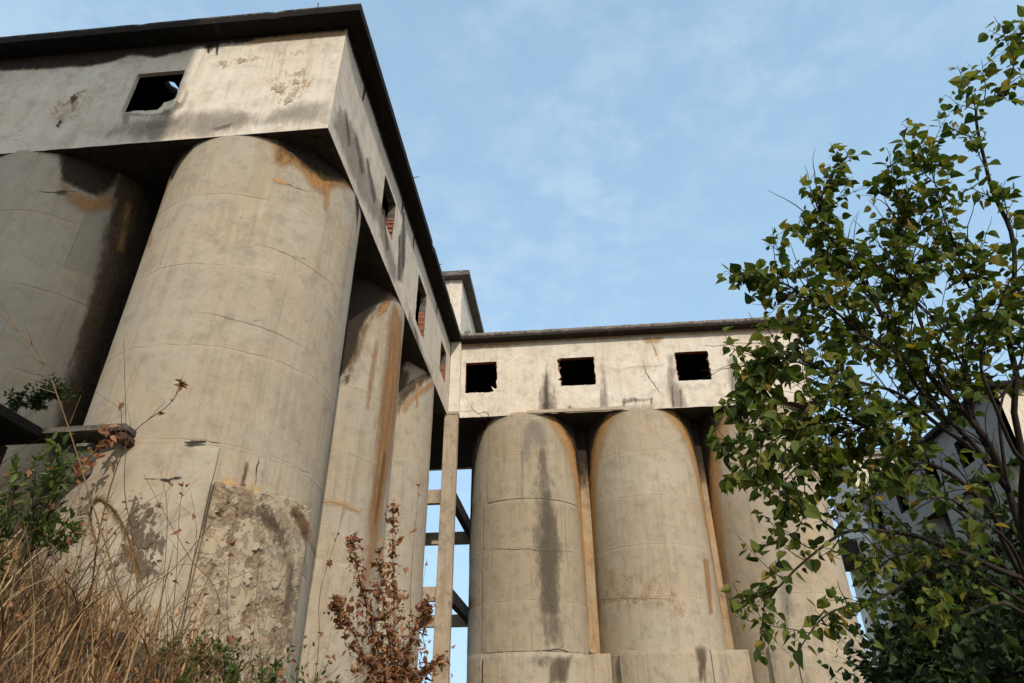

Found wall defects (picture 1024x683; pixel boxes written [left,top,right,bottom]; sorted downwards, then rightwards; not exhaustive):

leakage [0,29,450,343]
peeling [274,78,299,104]
corrosion [277,147,347,190]
leakage [57,174,144,427]
spalling [293,507,316,555]
corrosion [361,307,433,601]
leakage [522,425,559,641]
leakage [540,658,569,682]